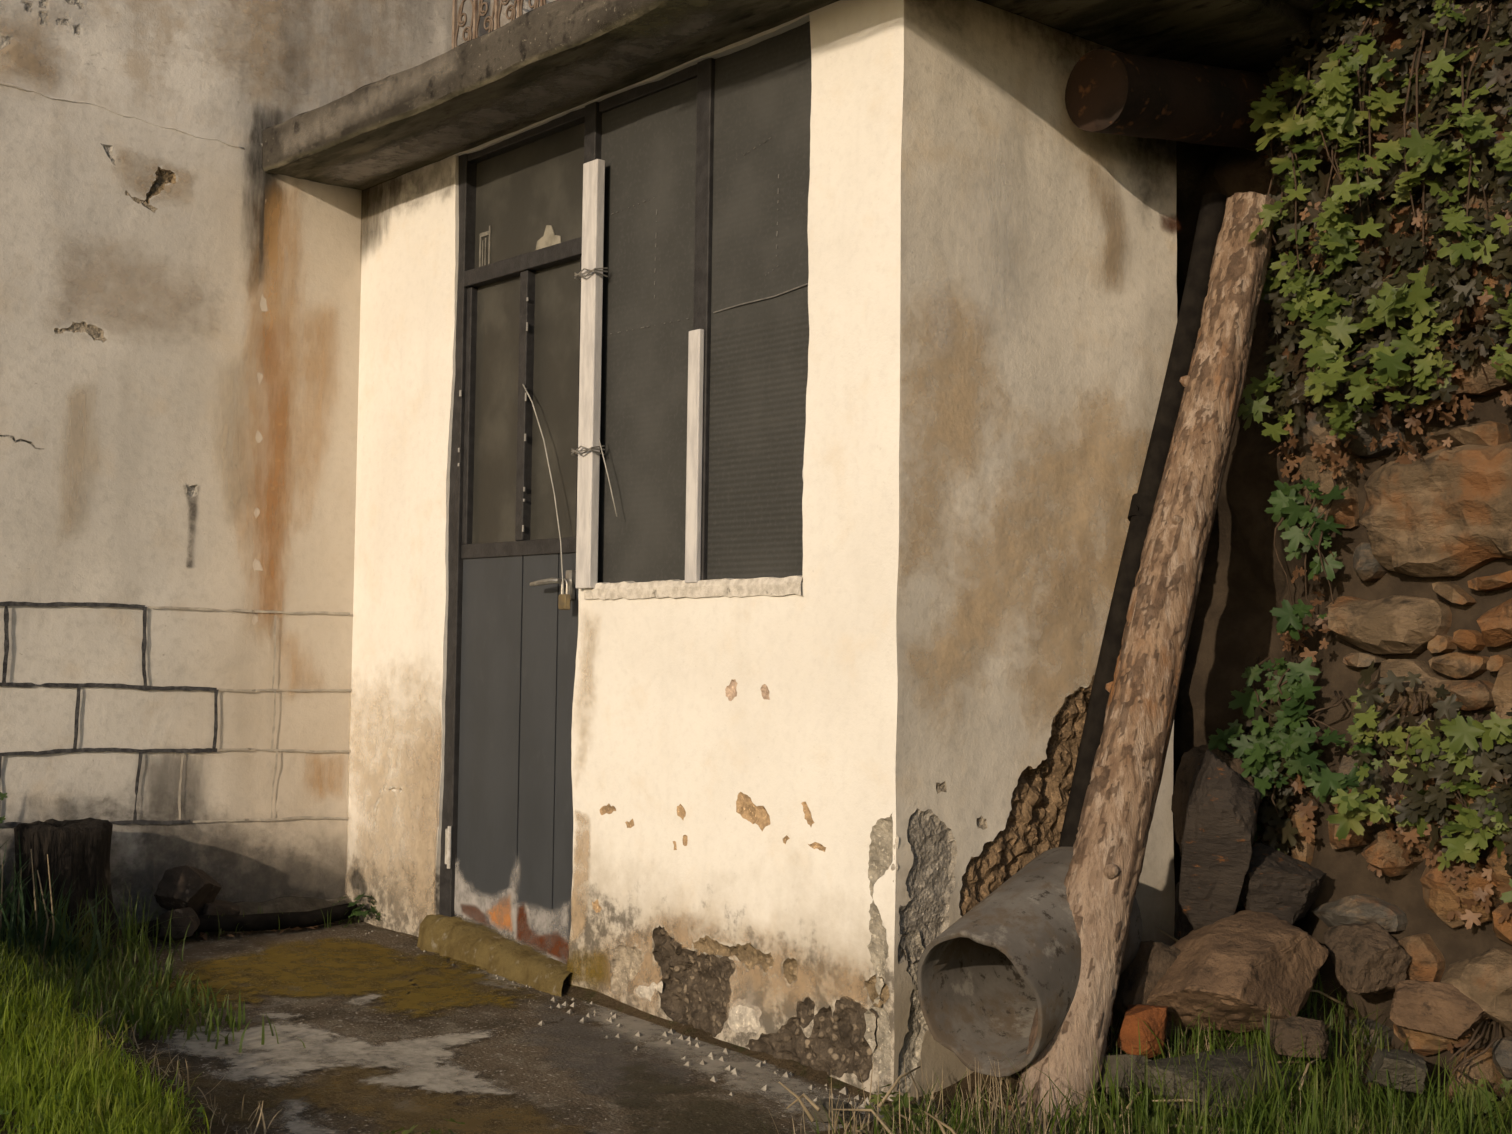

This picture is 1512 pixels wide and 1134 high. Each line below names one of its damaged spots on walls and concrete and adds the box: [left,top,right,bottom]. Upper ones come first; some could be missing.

peeling [21,0,84,35]
spalling [100,143,124,165]
spalling [125,167,186,213]
water stain [249,114,281,275]
rust [266,382,288,535]
water stain [913,399,1147,715]
water stain [115,805,347,924]
water stain [350,695,441,908]
rust [462,903,569,960]
spalling [611,675,1095,1093]